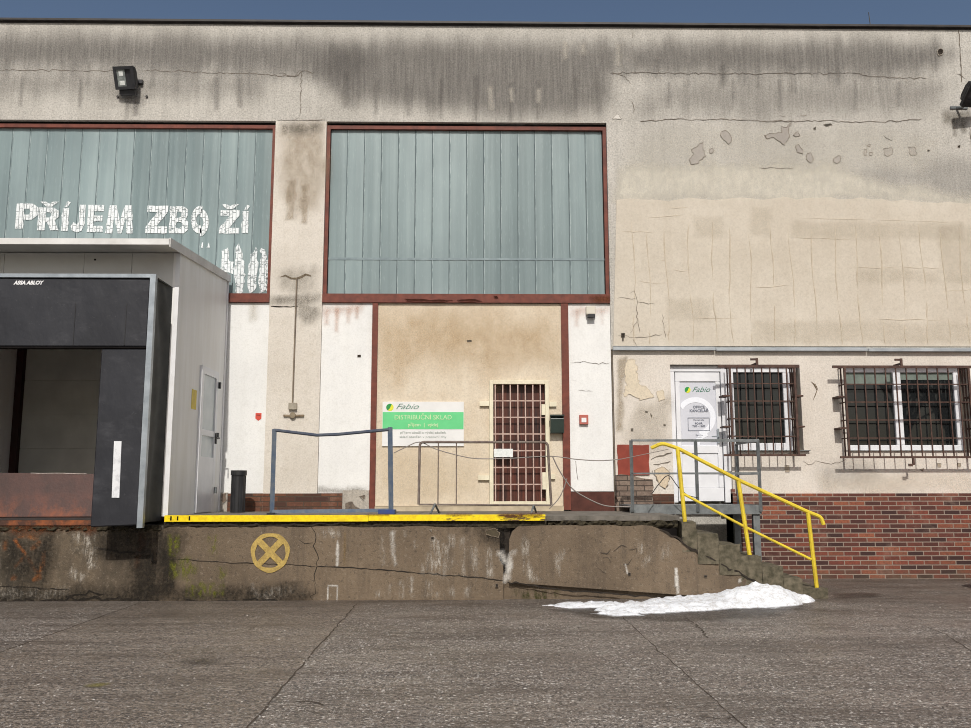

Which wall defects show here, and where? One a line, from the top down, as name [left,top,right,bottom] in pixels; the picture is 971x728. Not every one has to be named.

leakage [0,38,619,111]
leakage [633,43,939,73]
crack [614,70,922,141]
peeling [689,142,714,165]
peeling [764,122,814,163]
crack [618,291,666,344]
peeling [618,358,665,431]
spalling [654,467,670,489]
leakage [0,528,307,602]
crack [164,522,674,600]
crack [660,529,757,582]